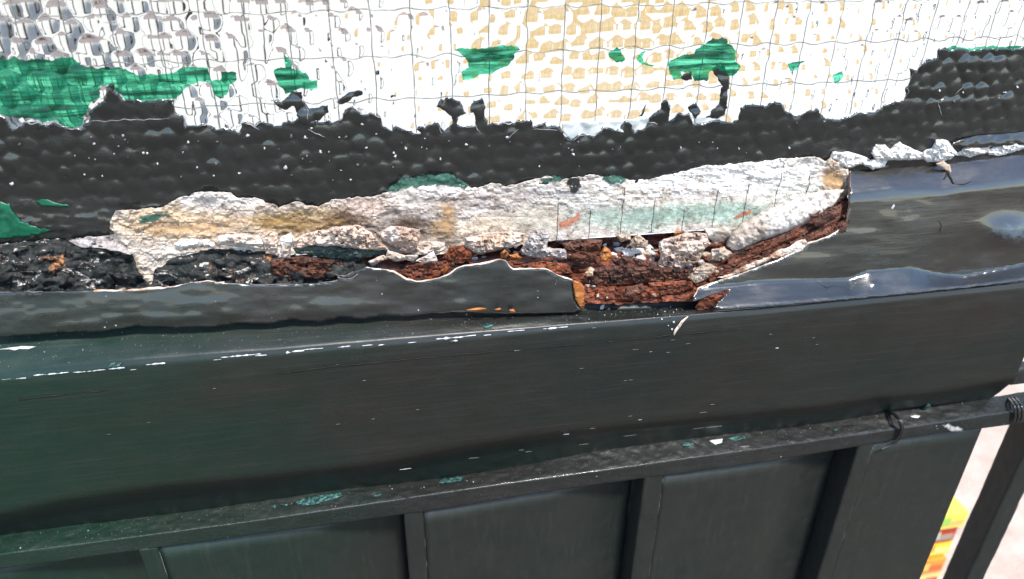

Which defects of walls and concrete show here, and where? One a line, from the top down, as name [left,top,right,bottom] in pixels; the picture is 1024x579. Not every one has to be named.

peeling [0,47,1024,255]
peeling [0,230,807,350]
corrosion [695,169,850,311]
spalling [18,362,165,379]